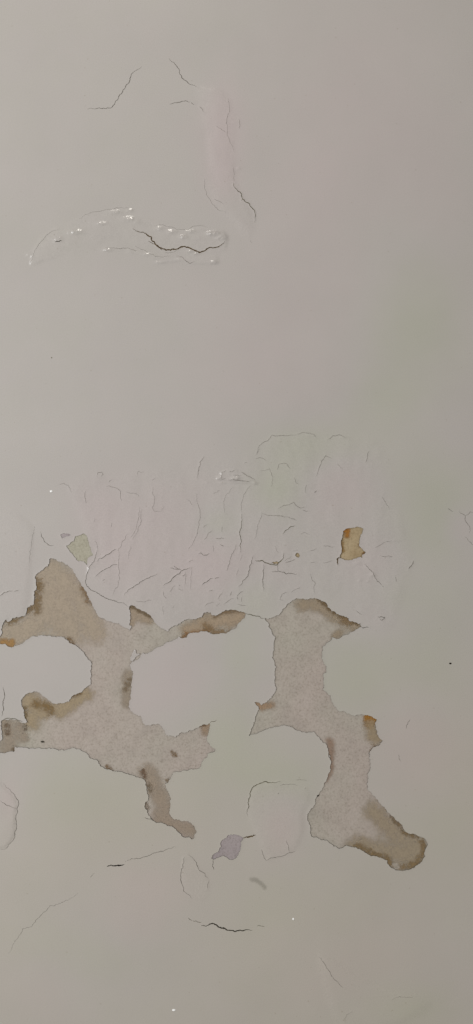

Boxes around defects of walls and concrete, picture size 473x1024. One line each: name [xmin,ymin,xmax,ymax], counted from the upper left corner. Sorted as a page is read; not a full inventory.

crack [137,231,225,253]
crack [85,518,293,606]
peeling [338,525,367,562]
peeling [0,532,247,841]
peeling [248,596,429,872]
peeling [210,833,245,861]
crack [94,848,264,932]